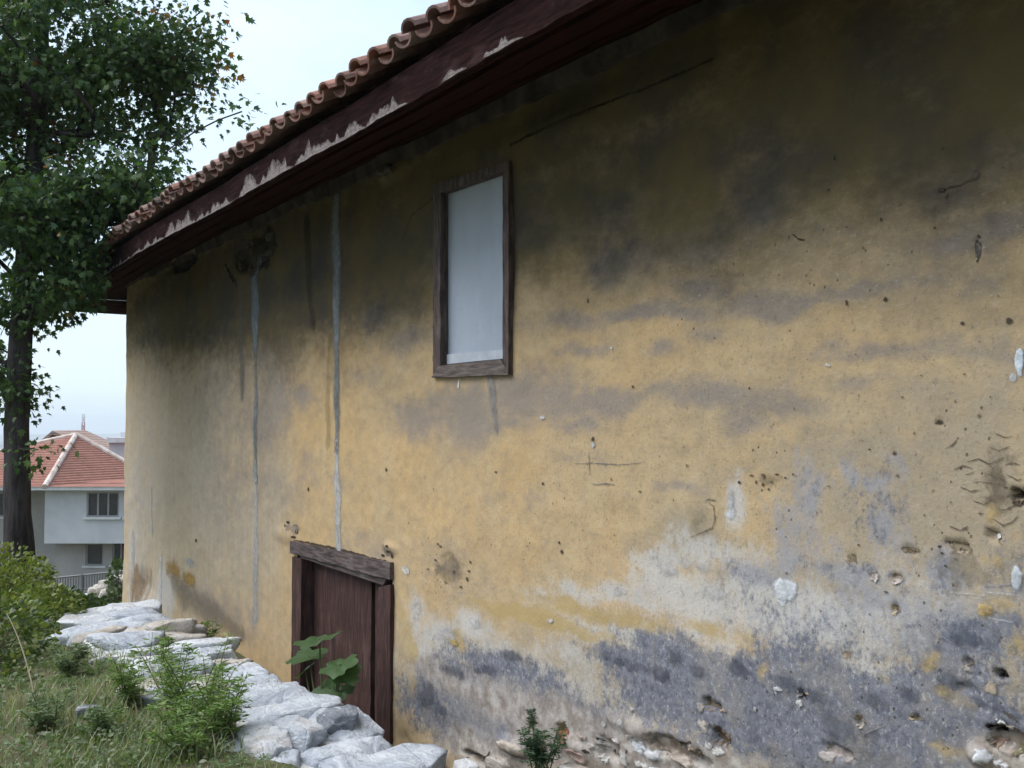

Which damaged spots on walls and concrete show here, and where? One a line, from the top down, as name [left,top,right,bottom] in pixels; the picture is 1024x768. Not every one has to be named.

leakage [331,193,341,551]
leakage [251,255,262,624]
crack [945,432,1024,544]
flaking render [556,697,731,768]
peeling [769,675,865,763]
peeling [926,659,974,697]
flaking render [972,671,1024,768]